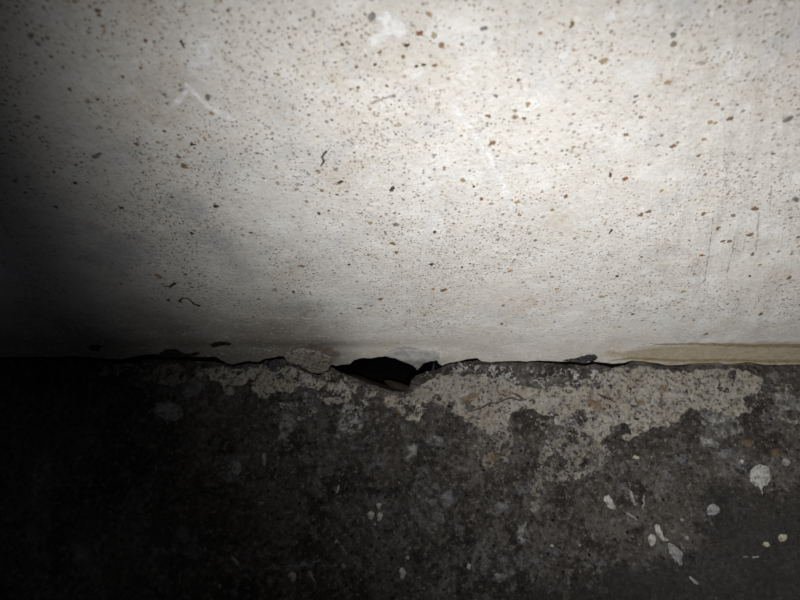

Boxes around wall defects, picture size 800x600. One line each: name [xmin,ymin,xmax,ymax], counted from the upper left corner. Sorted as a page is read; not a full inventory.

crack [0,354,327,375]
crack [434,358,800,370]
leakage [612,343,800,364]
spalling [99,349,765,516]